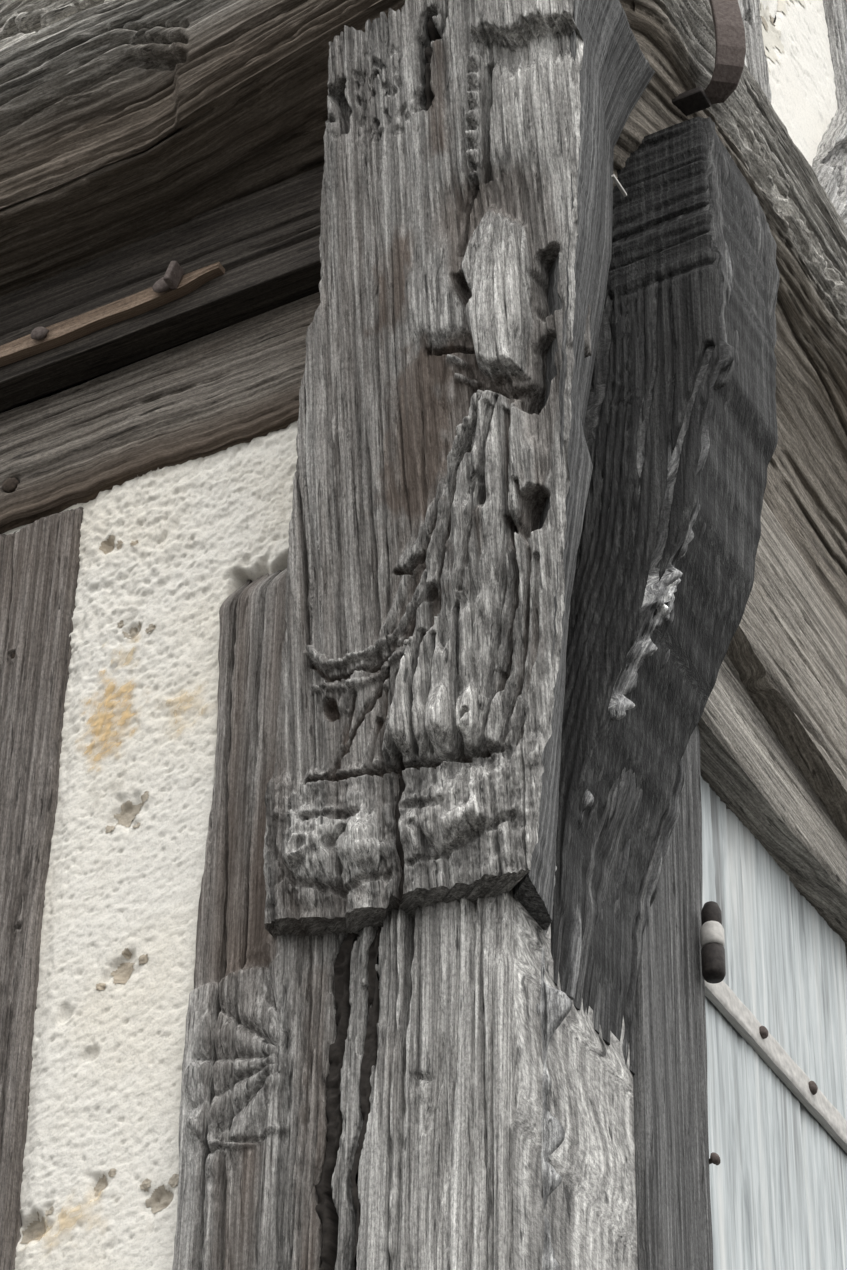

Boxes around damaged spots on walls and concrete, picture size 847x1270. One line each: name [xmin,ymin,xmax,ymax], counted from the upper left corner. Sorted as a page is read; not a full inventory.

water stain [84,670,135,761]
spalling [96,948,148,991]
crack [315,759,406,1270]
spalling [140,1174,179,1213]
spalling [20,1206,54,1244]